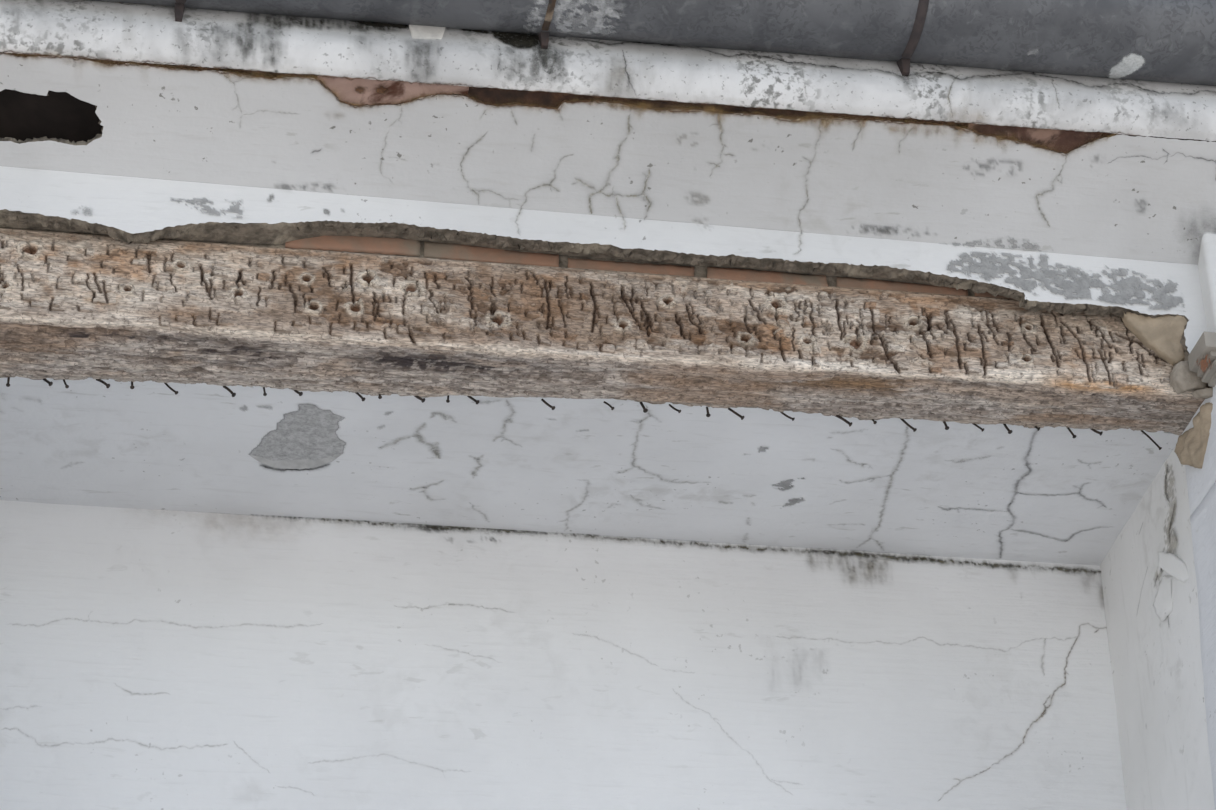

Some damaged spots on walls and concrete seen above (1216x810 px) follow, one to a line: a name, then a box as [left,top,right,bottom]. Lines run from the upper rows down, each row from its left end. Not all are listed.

crack [0,39,1213,227]
flaking render [0,52,1216,154]
flaking render [0,198,1213,471]